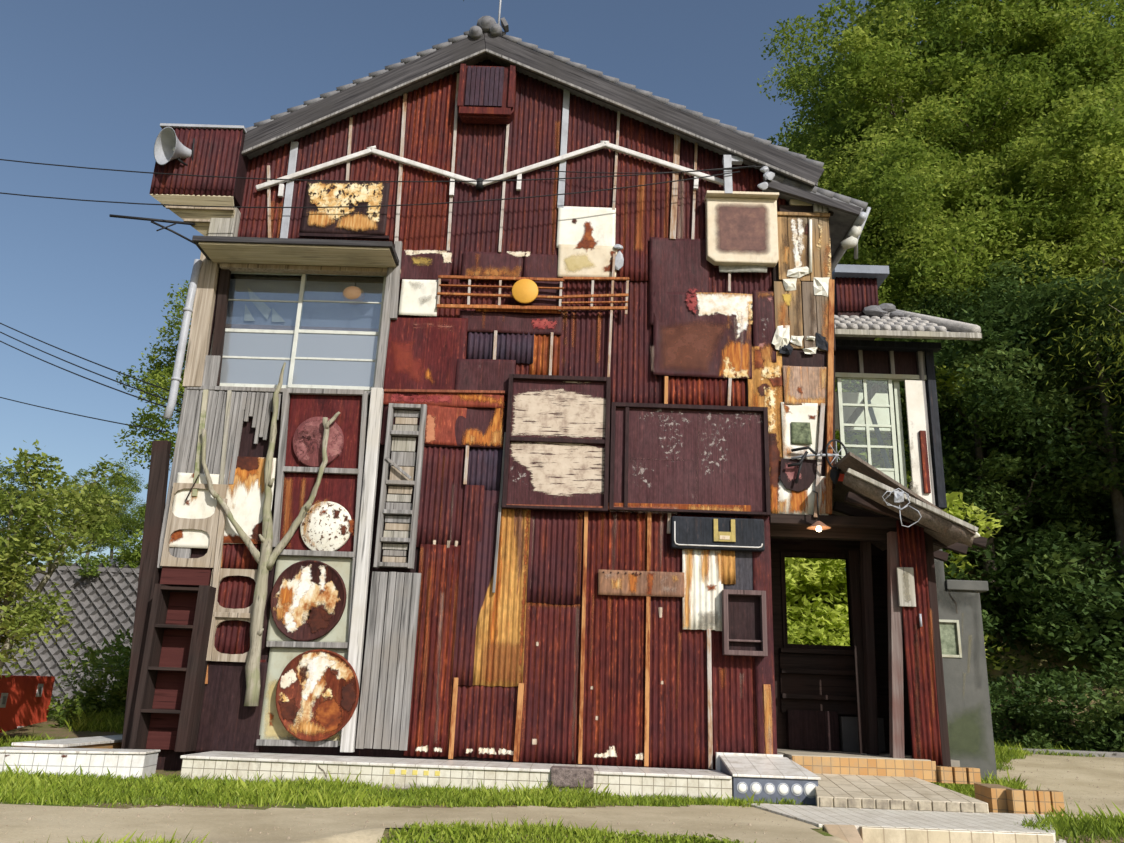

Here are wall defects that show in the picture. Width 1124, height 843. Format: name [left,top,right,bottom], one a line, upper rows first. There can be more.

peeling [308,182,384,231]
corrosion [565,222,616,272]
corrosion [390,393,503,446]
peeling [510,381,606,496]
corrosion [662,323,826,513]
corrosion [307,608,332,633]
corrosion [482,509,579,683]
corrosion [608,572,654,595]
corrosion [667,549,722,628]
corrosion [278,699,298,723]
corrosion [315,670,356,734]